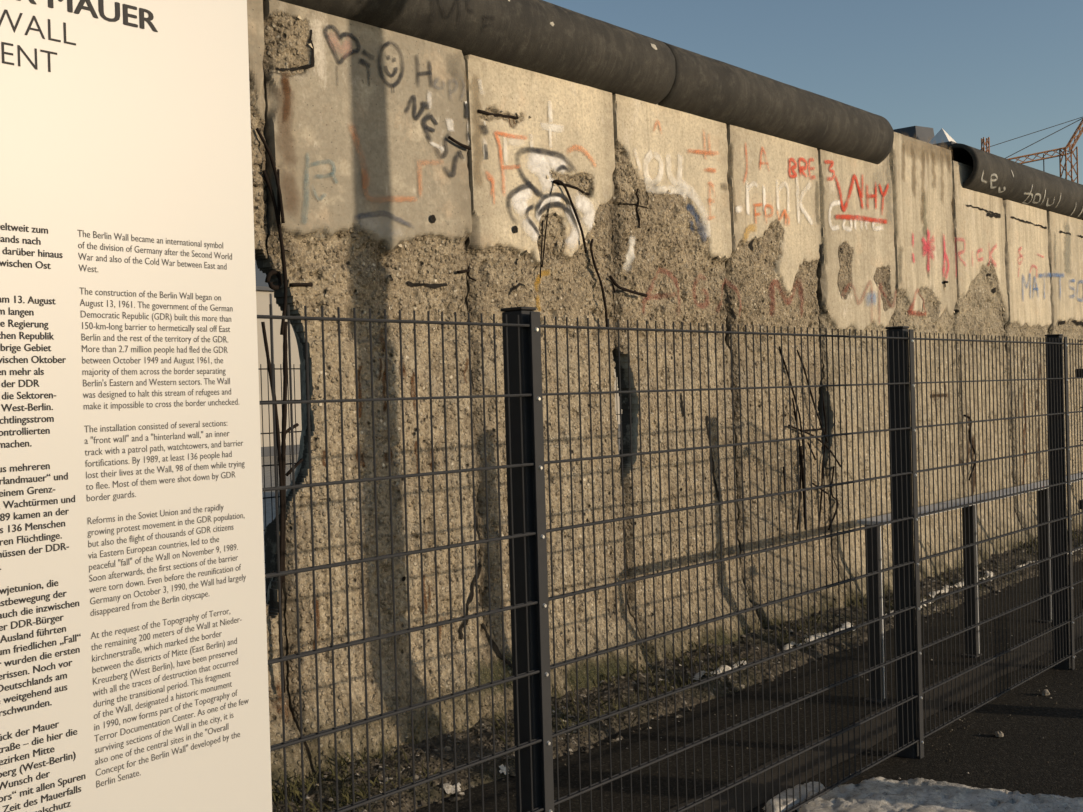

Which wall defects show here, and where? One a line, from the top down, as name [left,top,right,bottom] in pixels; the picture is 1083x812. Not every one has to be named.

spalling [263,10,314,77]
spalling [249,75,1083,790]
crack [459,490,512,667]